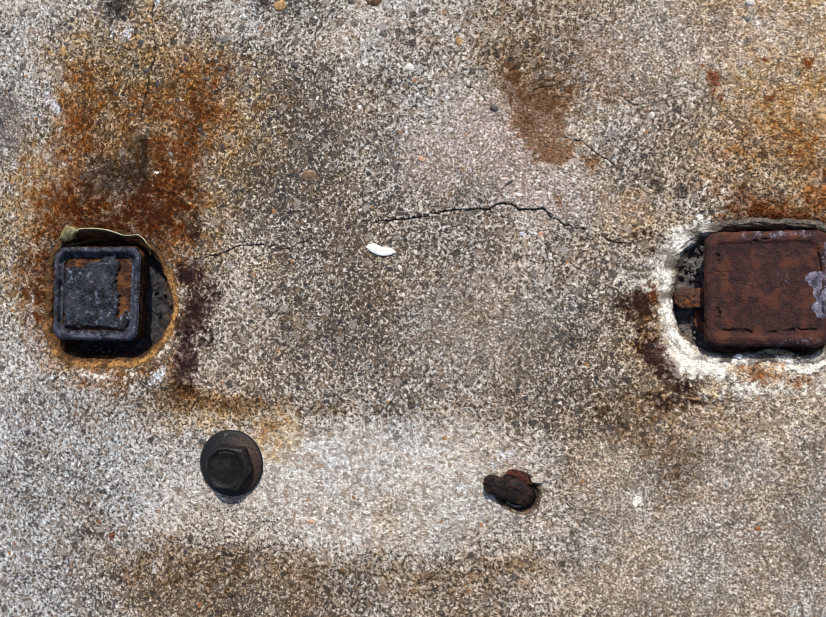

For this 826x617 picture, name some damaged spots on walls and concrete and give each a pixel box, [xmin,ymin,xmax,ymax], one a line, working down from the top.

rust [173,264,220,391]
crack [181,240,309,263]
crack [376,202,584,237]
spalling [657,216,826,369]